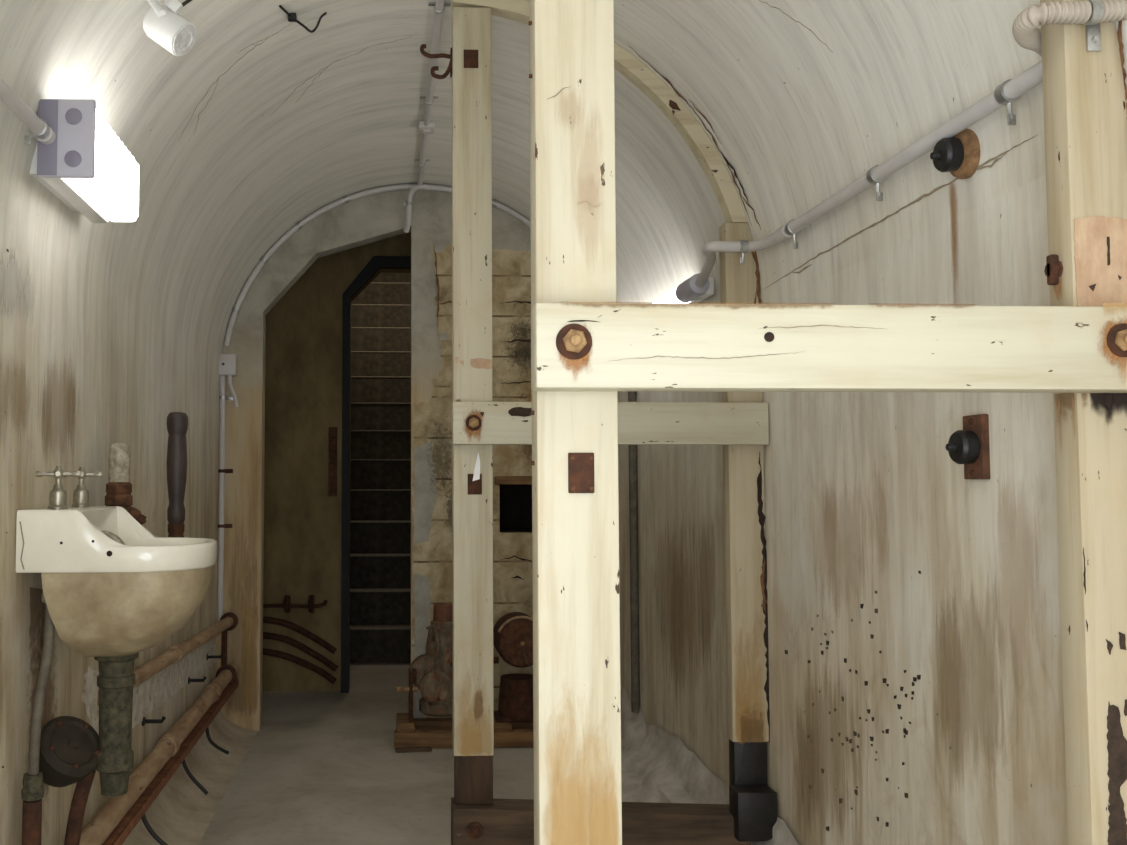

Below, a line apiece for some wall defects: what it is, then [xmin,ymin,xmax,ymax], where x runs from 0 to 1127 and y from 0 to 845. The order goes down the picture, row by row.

crack [612,46,1037,361]
rust [560,351,590,371]
rust [1103,320,1127,370]
peeling [1106,632,1127,655]
peeling [1107,699,1127,845]